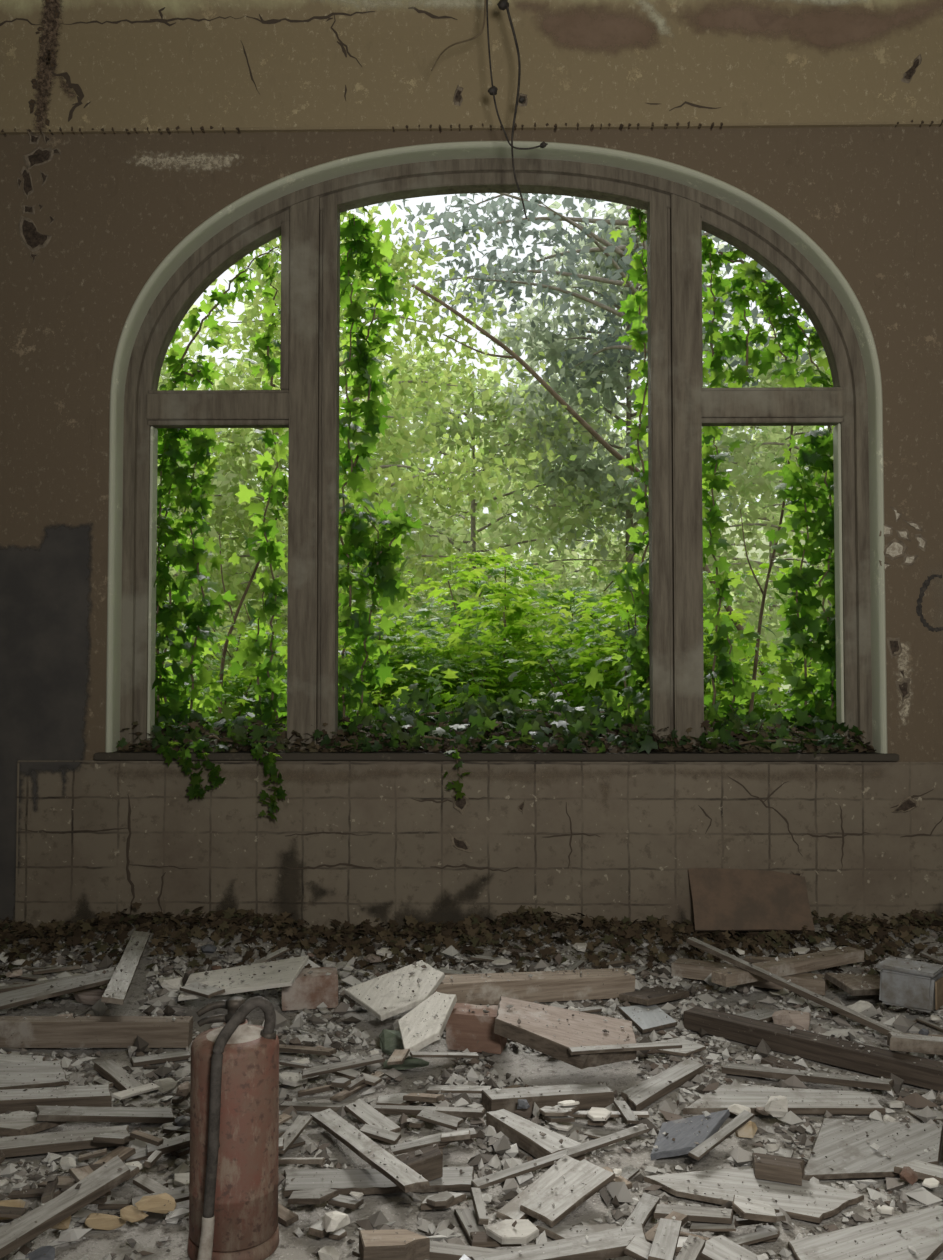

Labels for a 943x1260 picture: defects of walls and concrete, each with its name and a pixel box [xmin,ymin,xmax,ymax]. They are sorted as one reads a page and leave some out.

crack [0,7,375,100]
crack [408,7,458,20]
crack [21,795,195,915]
crack [728,776,943,870]